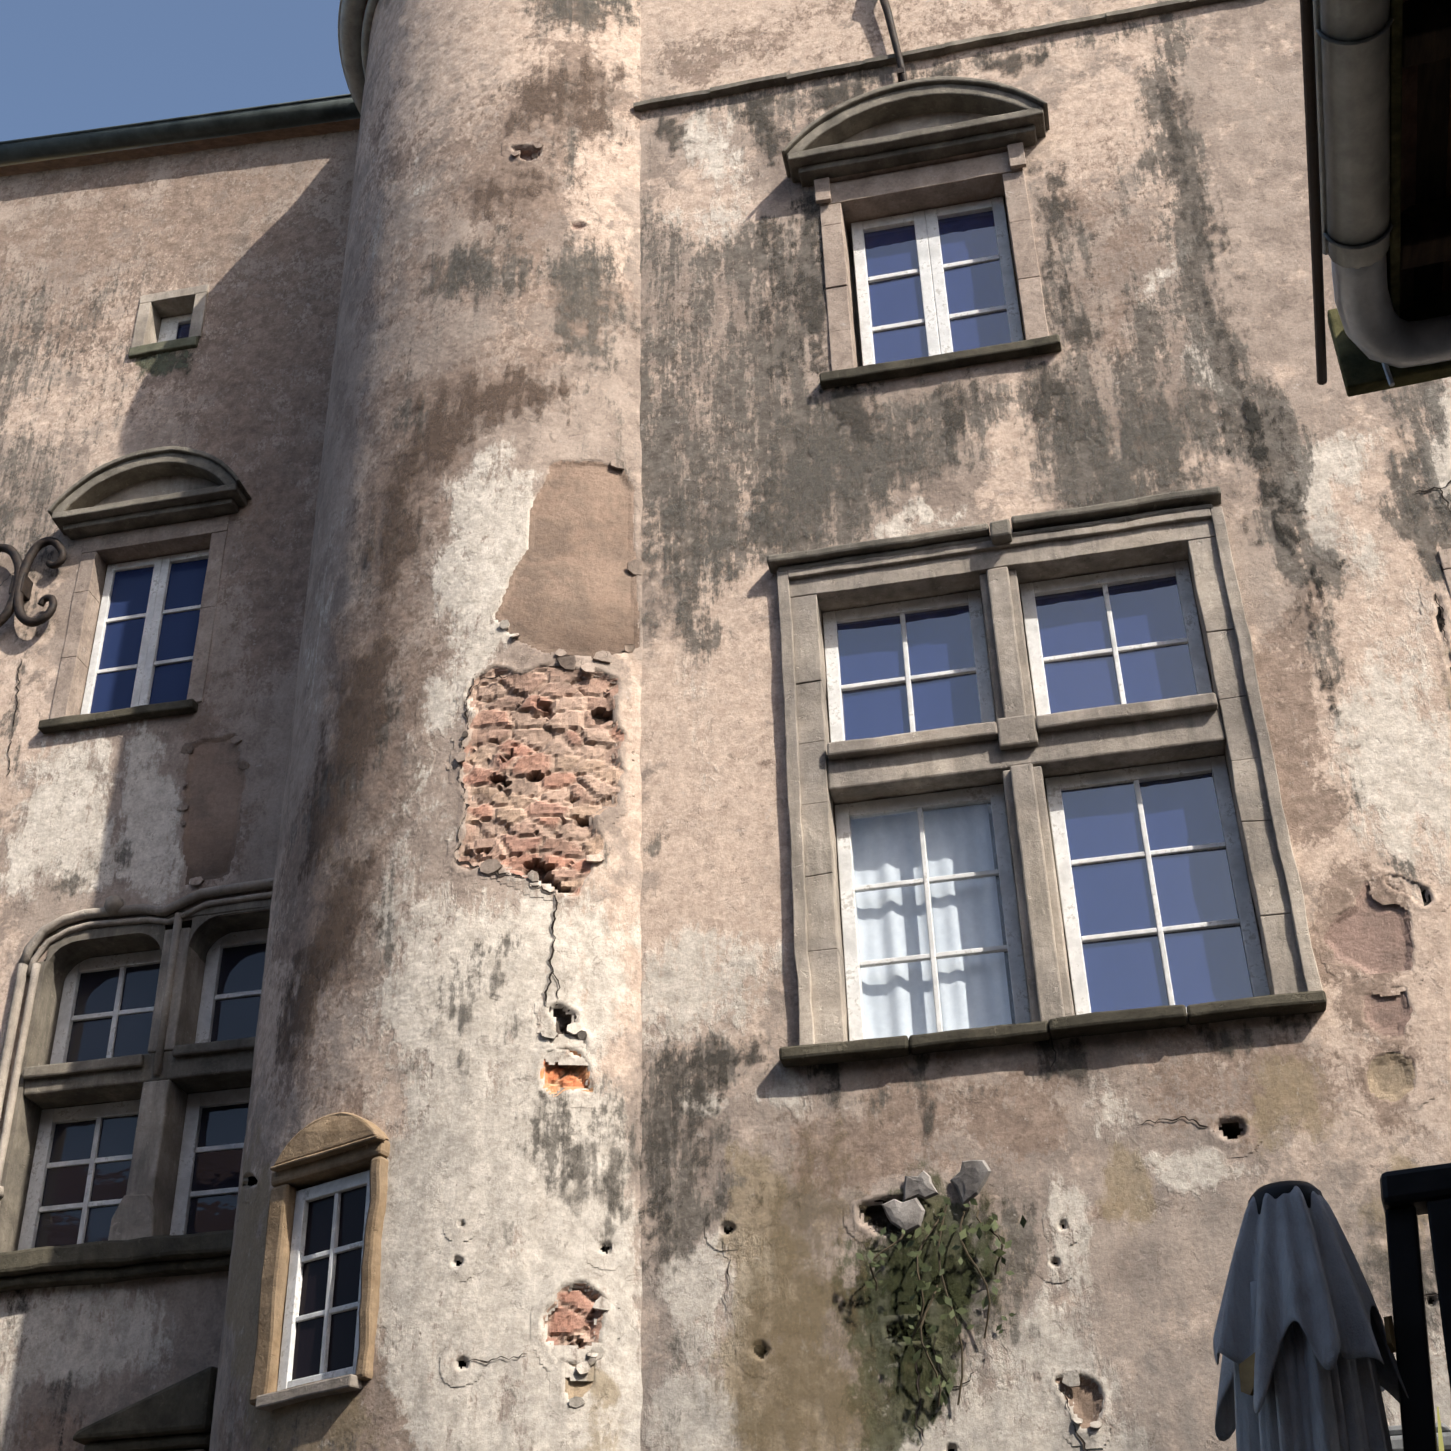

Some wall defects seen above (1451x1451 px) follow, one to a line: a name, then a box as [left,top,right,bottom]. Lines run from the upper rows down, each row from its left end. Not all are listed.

leakage [482,56,630,145]
leakage [977,46,1048,76]
leakage [1024,75,1333,640]
leakage [641,196,983,635]
crack [1415,480,1451,512]
crack [1434,593,1451,656]
flaking render [443,451,644,907]
flaking render [1309,863,1451,1116]
crack [1141,1116,1214,1132]
flaking render [843,1160,991,1251]
crack [913,1337,974,1451]
flaking render [1039,1361,1122,1449]